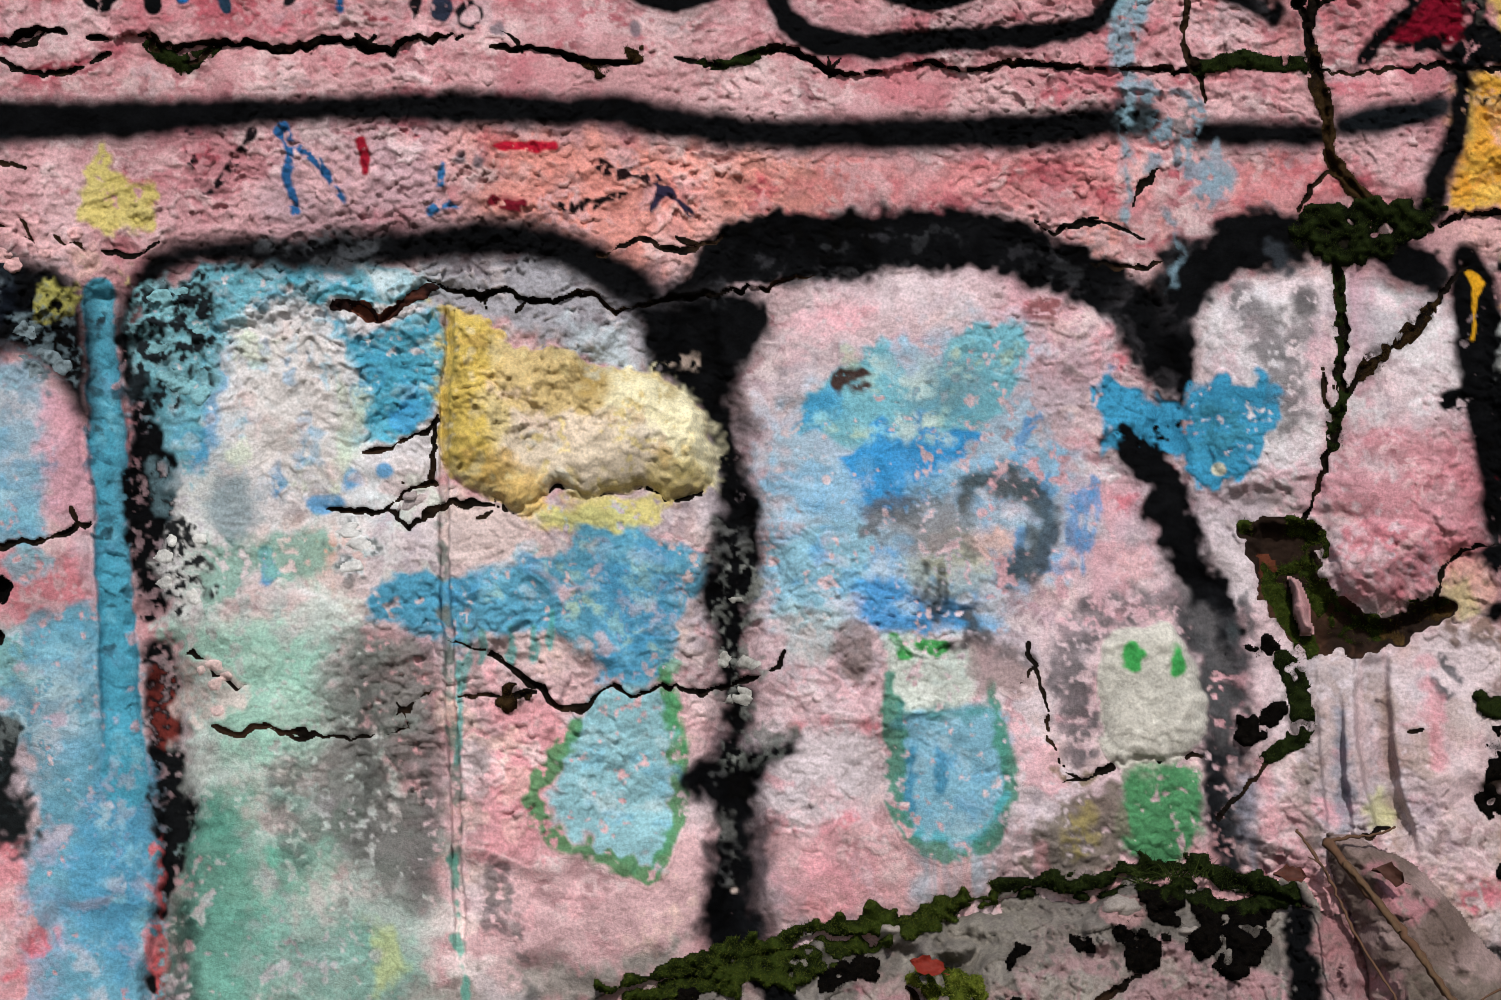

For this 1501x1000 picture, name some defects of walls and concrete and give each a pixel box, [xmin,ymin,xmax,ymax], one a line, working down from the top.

crack [0,25,637,78]
crack [674,0,1207,104]
crack [1298,0,1501,95]
crack [1296,148,1330,213]
crack [326,414,514,531]
crack [549,483,565,493]
crack [600,486,704,503]
crack [0,506,92,552]
crack [186,640,786,742]